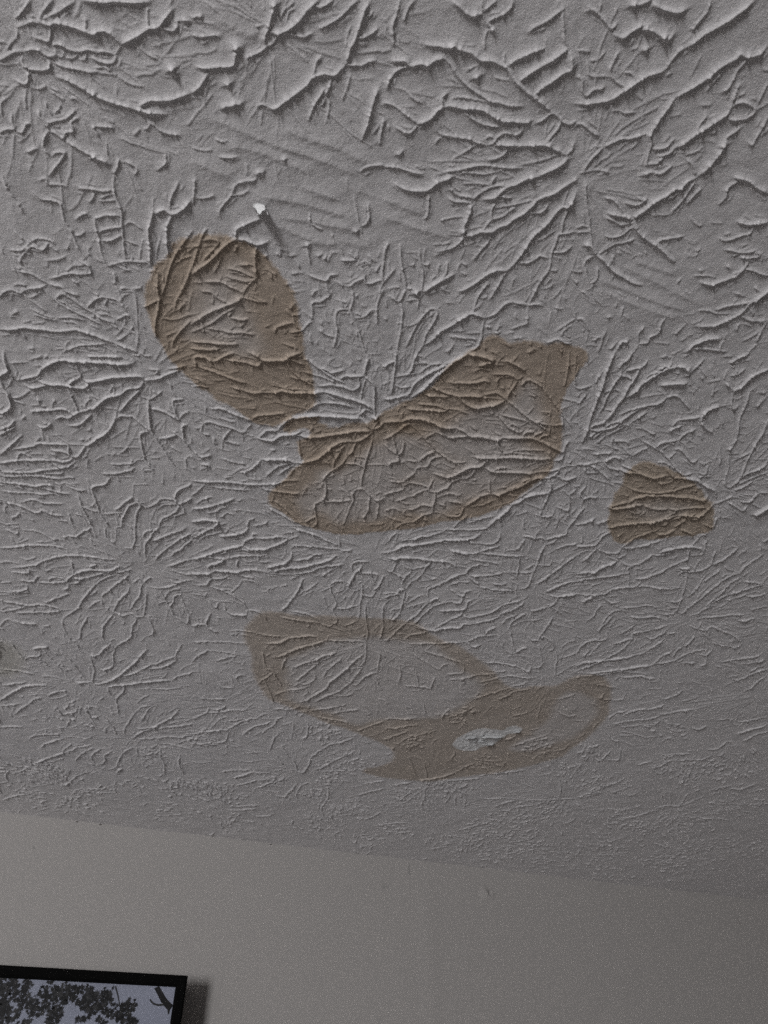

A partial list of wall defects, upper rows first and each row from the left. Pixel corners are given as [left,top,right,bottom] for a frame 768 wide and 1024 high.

damp [145,234,588,535]
damp [607,462,714,544]
damp [245,612,610,782]